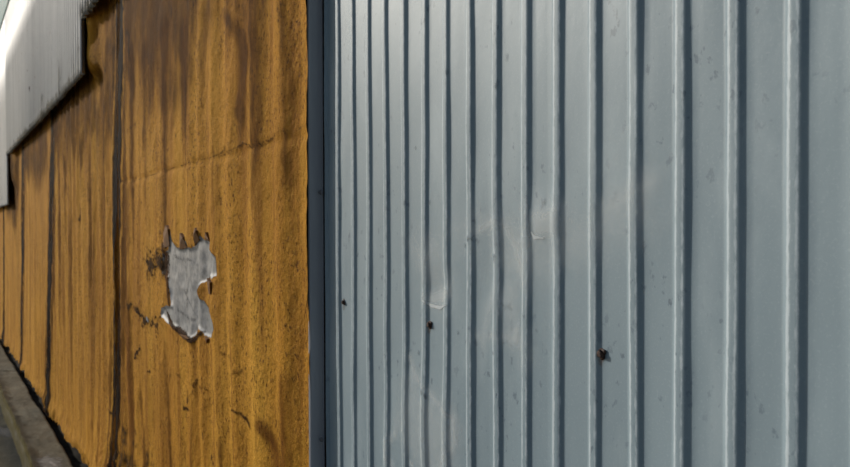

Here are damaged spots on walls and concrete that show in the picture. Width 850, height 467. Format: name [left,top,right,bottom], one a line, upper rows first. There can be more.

water stain [7,0,210,229]
water stain [225,0,264,170]
peeling [161,225,217,343]